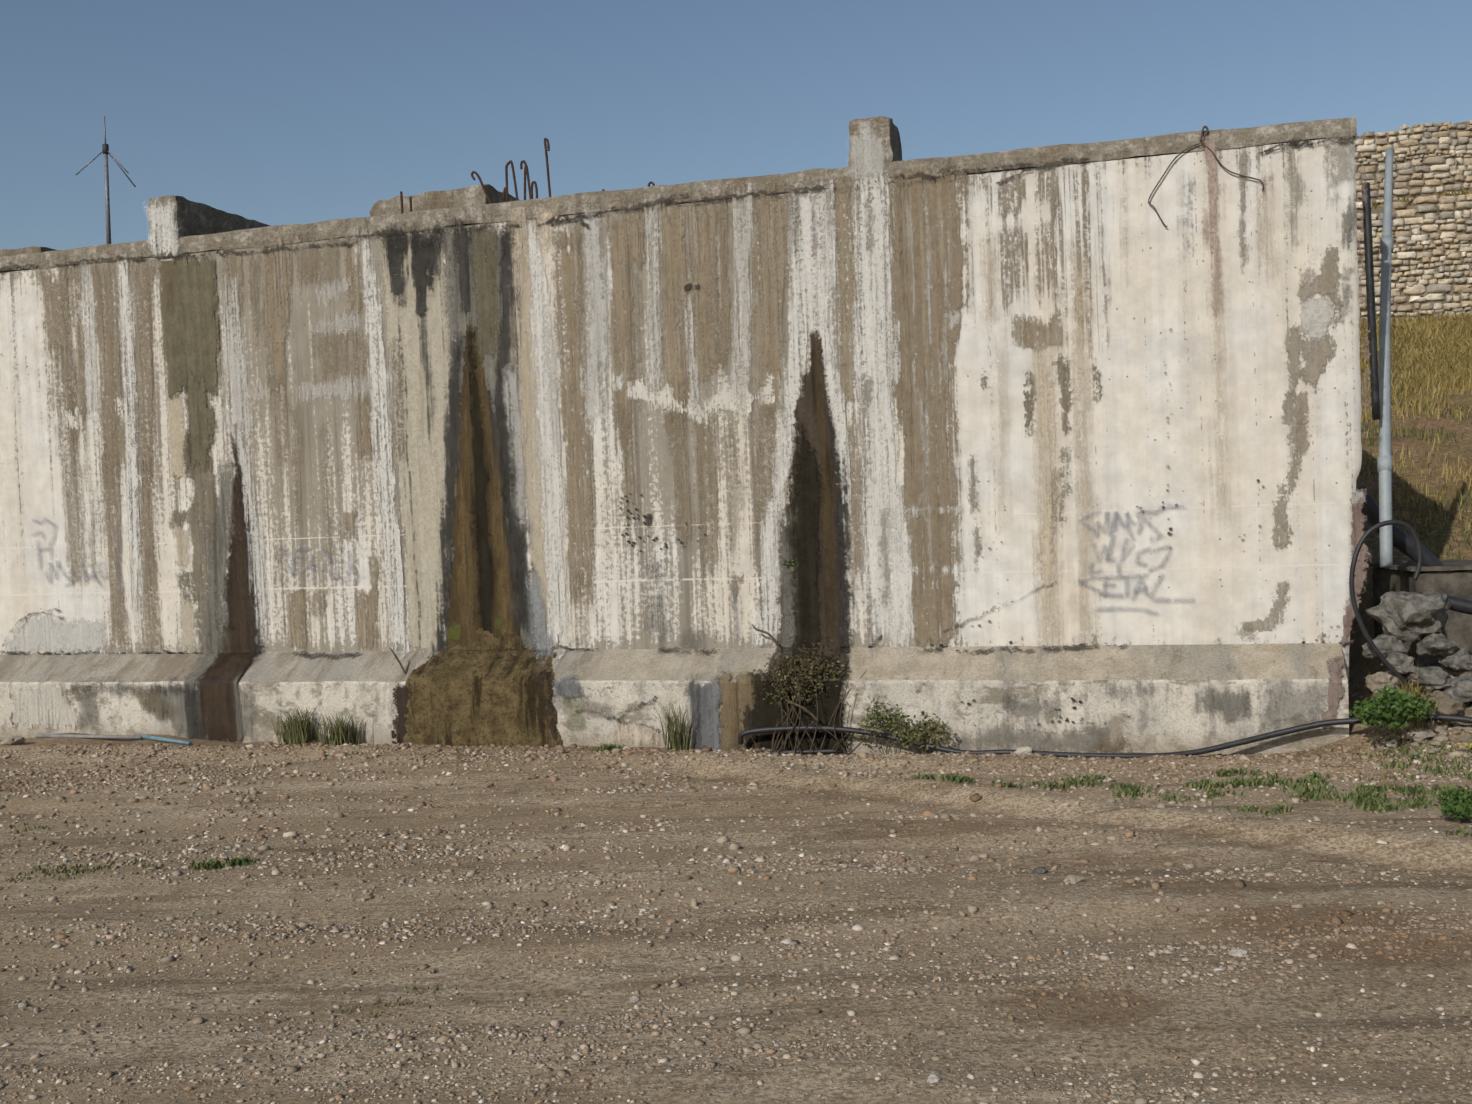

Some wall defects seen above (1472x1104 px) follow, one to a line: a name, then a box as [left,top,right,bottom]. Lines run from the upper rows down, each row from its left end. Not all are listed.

damp [143,203,268,743]
damp [354,219,585,744]
damp [580,123,913,754]